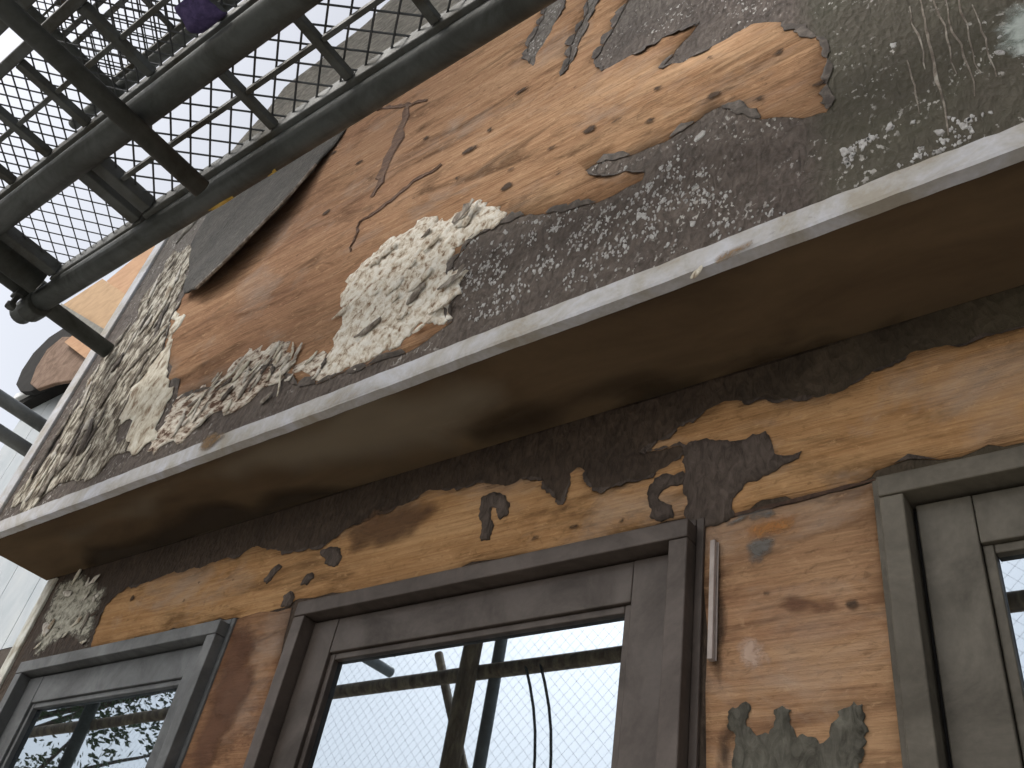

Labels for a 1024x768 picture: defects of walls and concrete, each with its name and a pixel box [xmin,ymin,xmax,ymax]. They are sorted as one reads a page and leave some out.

crack [349,99,442,252]
peeling [11,0,835,513]
damp [351,506,433,549]
peeling [33,326,1024,768]
damp [194,630,252,768]